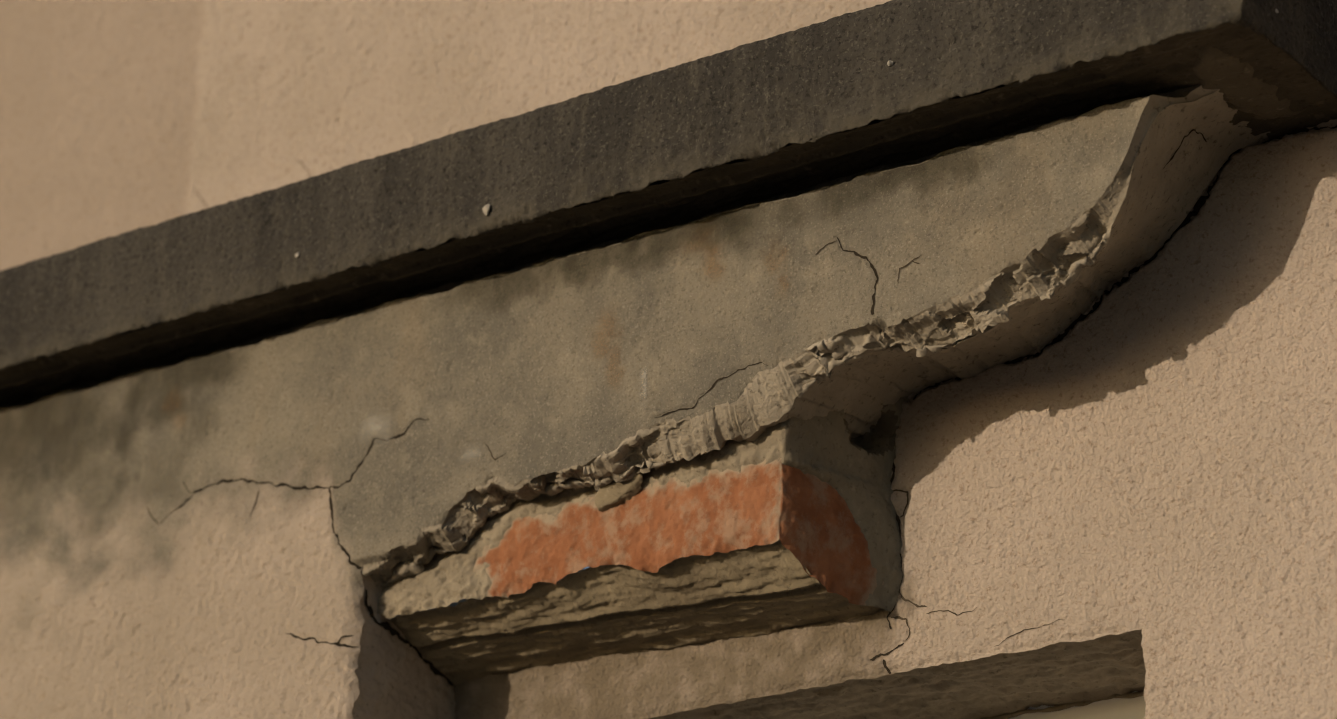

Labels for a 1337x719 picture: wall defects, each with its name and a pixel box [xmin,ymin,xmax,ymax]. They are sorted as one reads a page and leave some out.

crack [816,237,921,315]
spalling [871,161,1132,353]
crack [1004,125,1337,364]
crack [147,418,455,687]
peeling [362,355,812,619]
crack [870,462,977,674]
crack [994,619,1062,647]